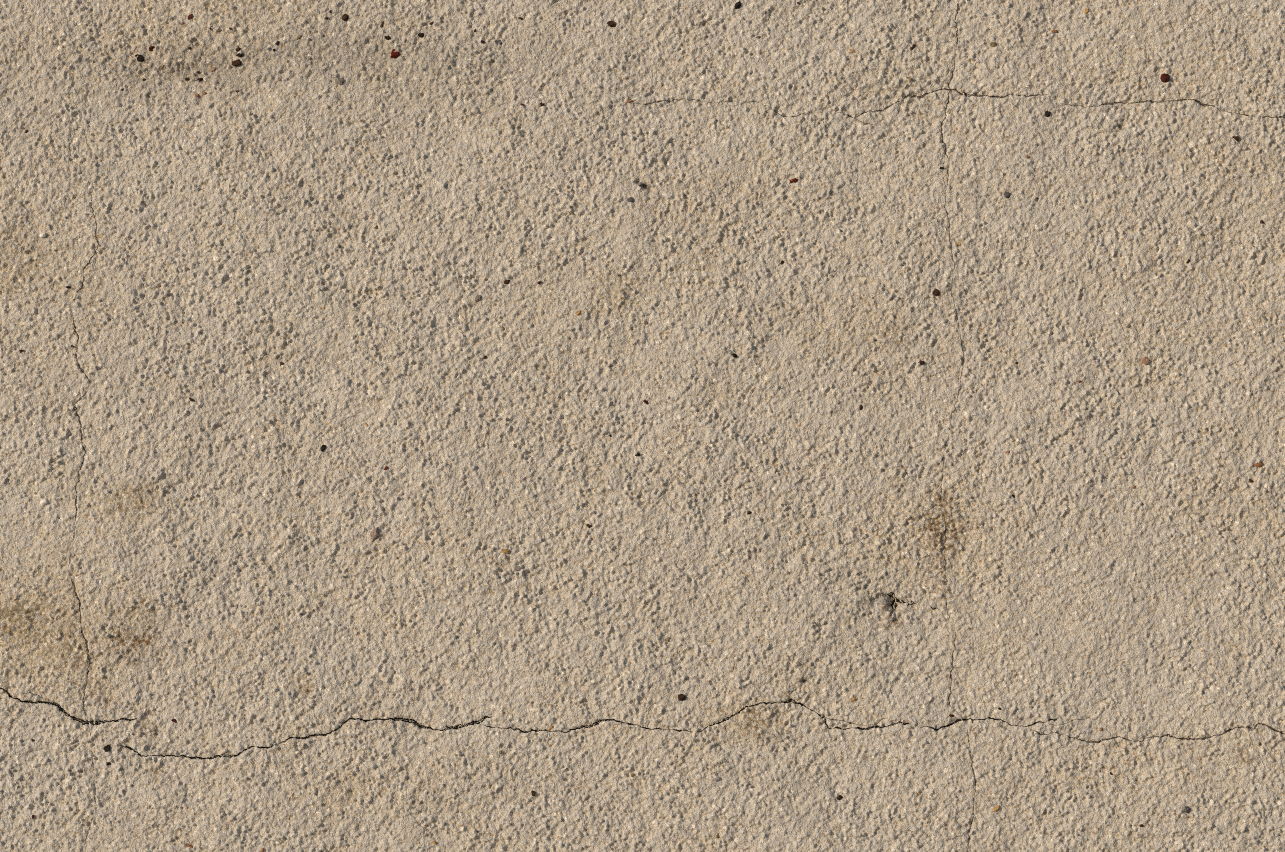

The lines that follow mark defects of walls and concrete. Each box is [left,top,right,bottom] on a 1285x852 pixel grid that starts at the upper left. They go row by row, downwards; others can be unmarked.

crack [0,183,140,844]
crack [120,635,1284,844]
crack [637,1,1047,618]
crack [1064,99,1285,118]